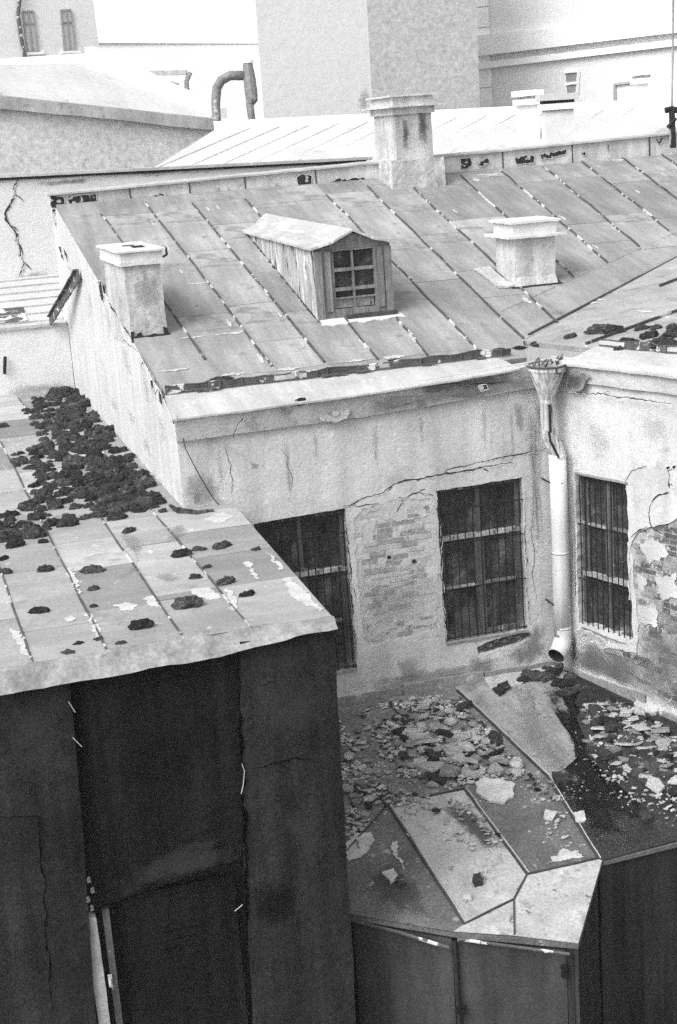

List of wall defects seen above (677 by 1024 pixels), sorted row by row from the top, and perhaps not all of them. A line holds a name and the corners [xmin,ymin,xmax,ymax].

crack [4,180,31,276]
crack [569,390,671,405]
flaking render [354,498,441,646]
crack [342,448,547,659]
flaking render [574,519,677,710]
crack [625,466,673,538]